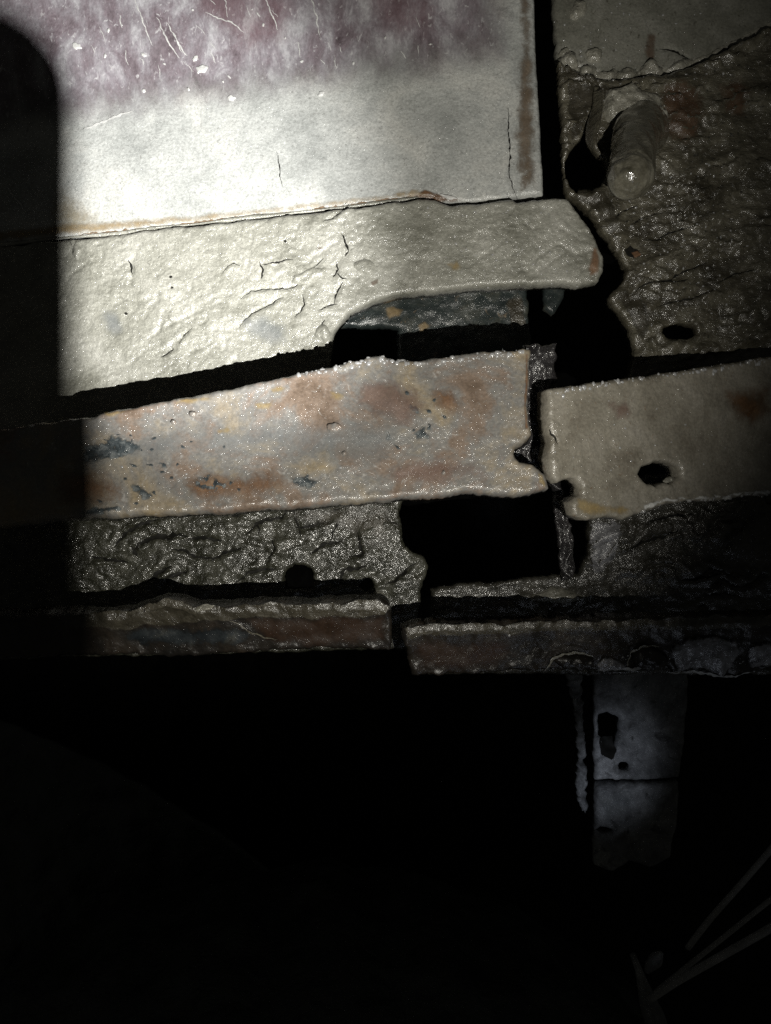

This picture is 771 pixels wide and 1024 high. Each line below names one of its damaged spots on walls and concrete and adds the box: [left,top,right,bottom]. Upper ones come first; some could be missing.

corrosion [516,0,534,186]
crack [508,110,517,197]
crack [224,204,349,328]
spalling [625,246,641,258]
peeling [405,391,436,439]
peeling [514,343,558,471]
peeling [83,434,179,505]
peeling [194,475,240,492]
peeling [293,474,317,488]
peeling [547,481,575,581]